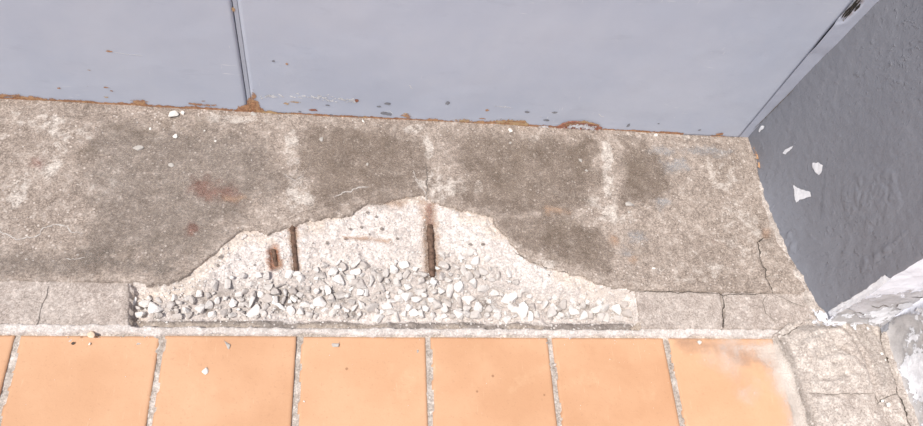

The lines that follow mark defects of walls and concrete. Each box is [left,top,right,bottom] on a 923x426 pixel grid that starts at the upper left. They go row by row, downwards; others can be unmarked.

corrosion [0,87,557,128]
corrosion [266,247,293,270]
spalling [127,196,641,332]
corrosion [422,202,439,272]
leakage [455,134,611,275]
crack [644,237,804,336]
peeling [793,185,811,202]
crack [817,297,923,426]
peeling [828,275,923,426]